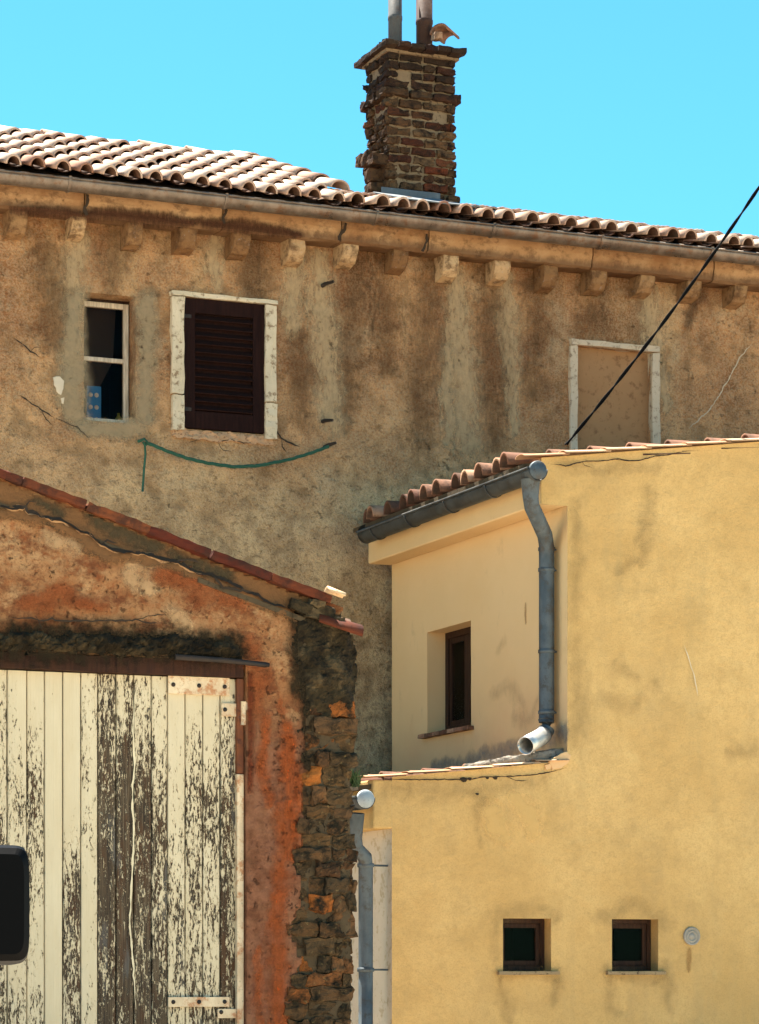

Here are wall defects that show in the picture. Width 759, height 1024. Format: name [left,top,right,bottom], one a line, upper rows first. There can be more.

crack [20,395,87,436]
spalling [53,376,64,404]
leakage [438,267,484,457]
leakage [496,271,523,436]
leakage [640,287,673,413]
crack [691,344,752,426]
crack [556,451,686,468]
crack [0,500,294,611]
leakage [0,619,249,667]
leakage [431,743,517,769]